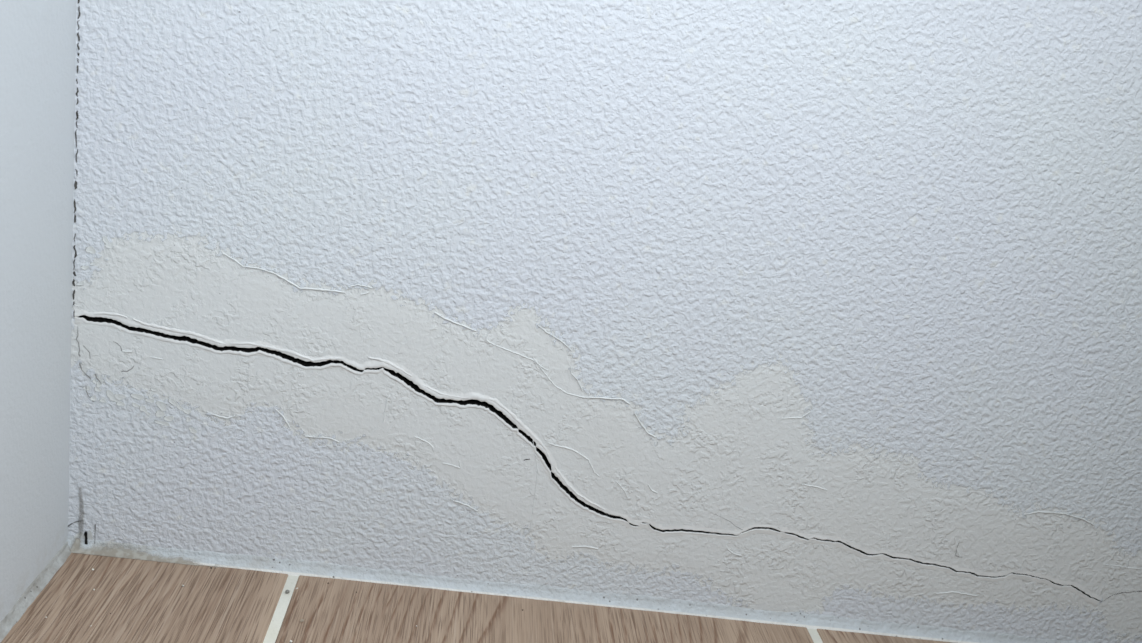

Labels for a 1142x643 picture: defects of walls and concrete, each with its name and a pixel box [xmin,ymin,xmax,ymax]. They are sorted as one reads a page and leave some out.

crack [73,0,81,223]
crack [72,233,1142,606]